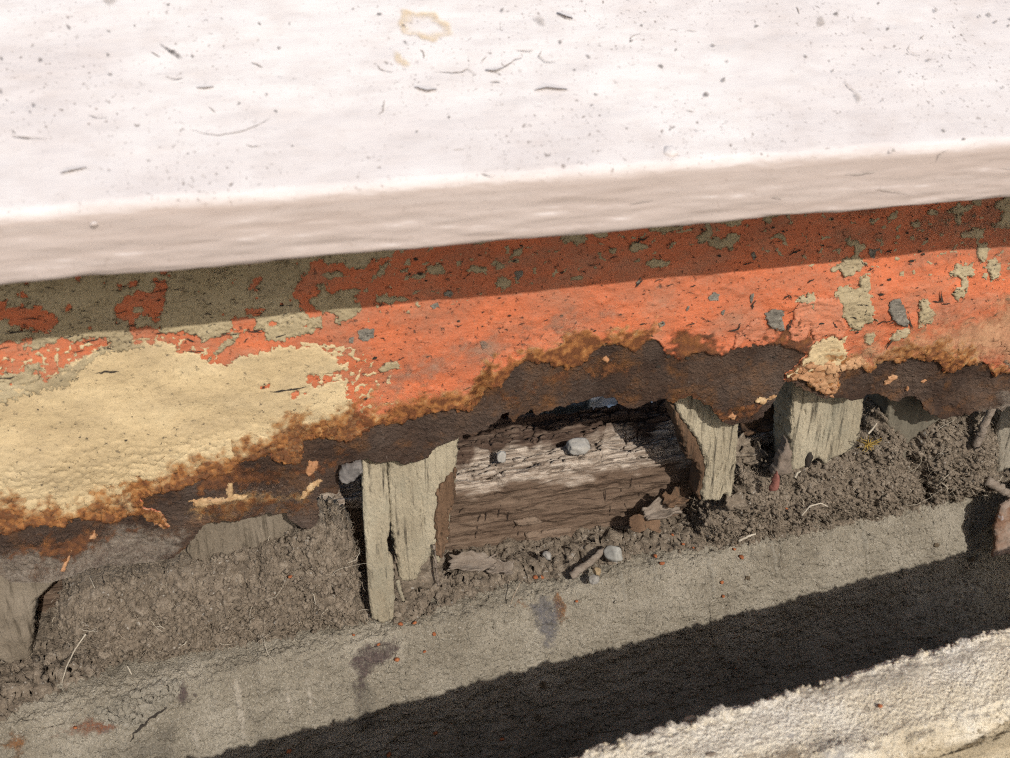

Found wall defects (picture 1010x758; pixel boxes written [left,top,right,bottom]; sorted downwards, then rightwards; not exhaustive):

peeling [879,278,926,331]
peeling [765,309,785,332]
peeling [349,328,377,343]
rust [0,322,1010,583]
peeling [299,448,322,500]
peeling [339,459,363,484]
peeling [188,483,247,508]